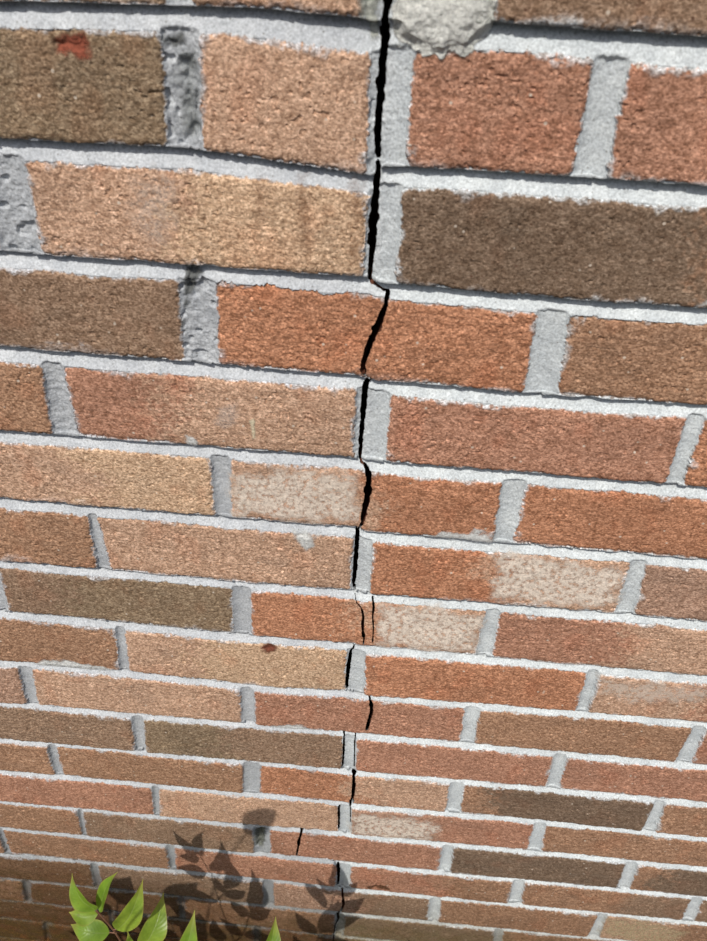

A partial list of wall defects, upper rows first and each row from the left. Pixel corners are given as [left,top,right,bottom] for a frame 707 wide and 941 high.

crack [337,0,393,816]
crack [333,862,345,941]